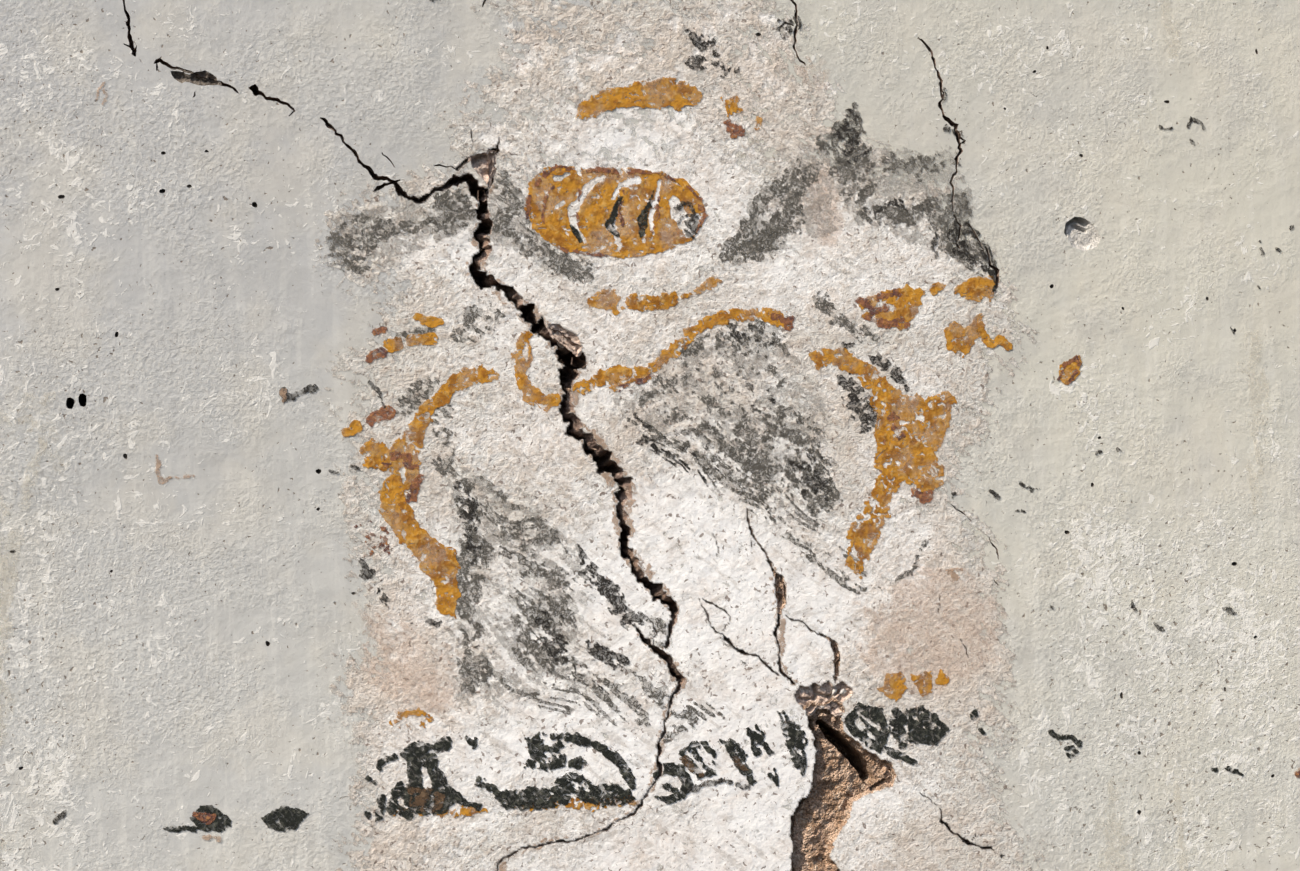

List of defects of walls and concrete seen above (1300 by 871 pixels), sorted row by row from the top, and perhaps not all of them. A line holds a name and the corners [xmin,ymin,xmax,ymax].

crack [123,0,840,871]
peeling [313,0,1054,871]
crack [918,37,1000,290]